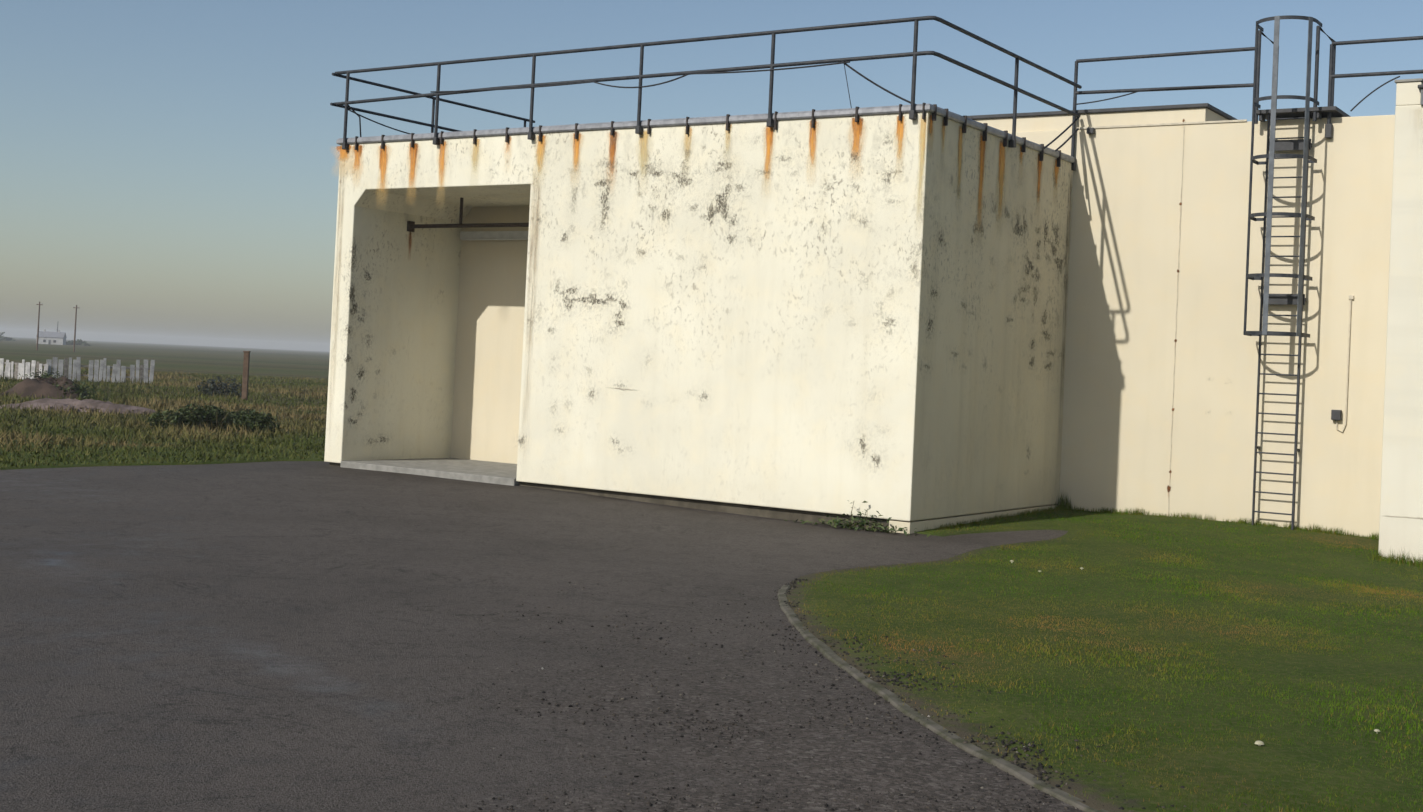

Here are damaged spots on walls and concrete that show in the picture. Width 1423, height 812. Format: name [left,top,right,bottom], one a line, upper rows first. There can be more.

rust [765,127,773,172]
rust [853,118,862,151]
rust [920,115,962,182]
rust [978,136,1059,207]